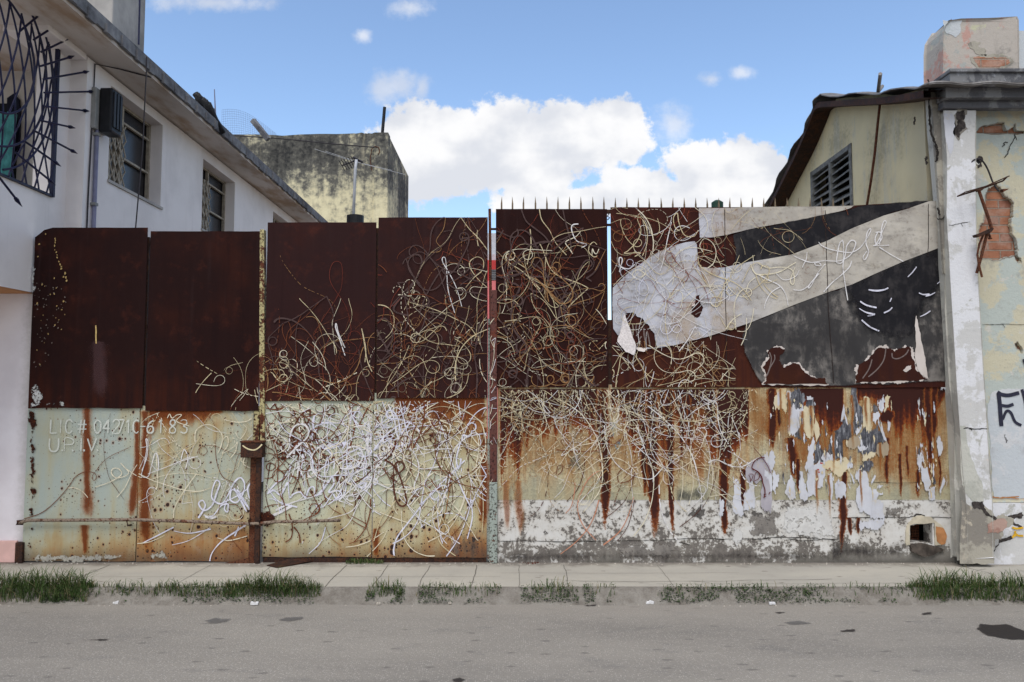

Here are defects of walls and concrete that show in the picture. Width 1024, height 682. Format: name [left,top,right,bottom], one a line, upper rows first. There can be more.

flaking render [943,20,1014,68]
flaking render [944,109,1020,156]
peeling [763,347,827,384]
peeling [855,347,926,383]
corrosion [80,408,92,553]
corrosion [395,387,946,548]
corrosion [261,511,275,525]